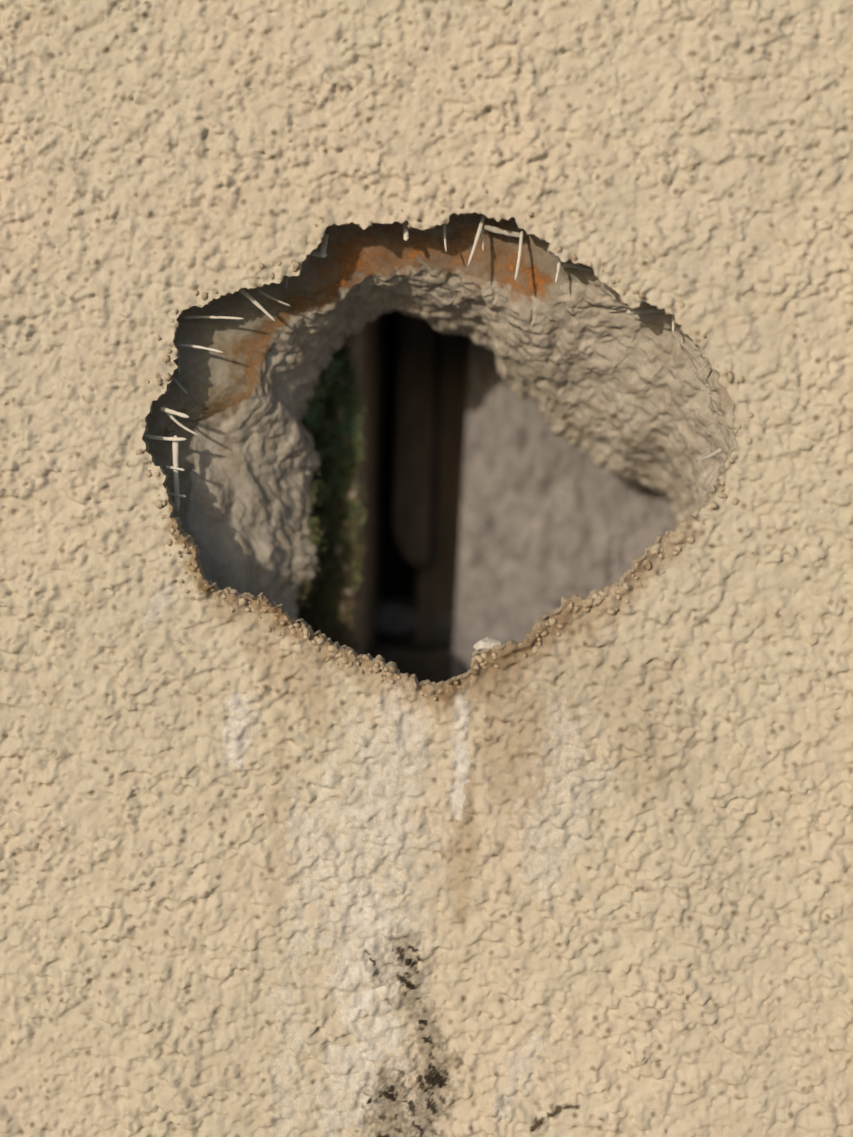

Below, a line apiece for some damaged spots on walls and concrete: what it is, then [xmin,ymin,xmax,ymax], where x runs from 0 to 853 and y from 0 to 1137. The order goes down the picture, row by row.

corrosion [205,221,551,411]
spalling [135,204,754,701]
damp [223,691,259,769]
damp [450,696,469,820]
damp [309,693,448,1137]
damp [530,1105,579,1132]